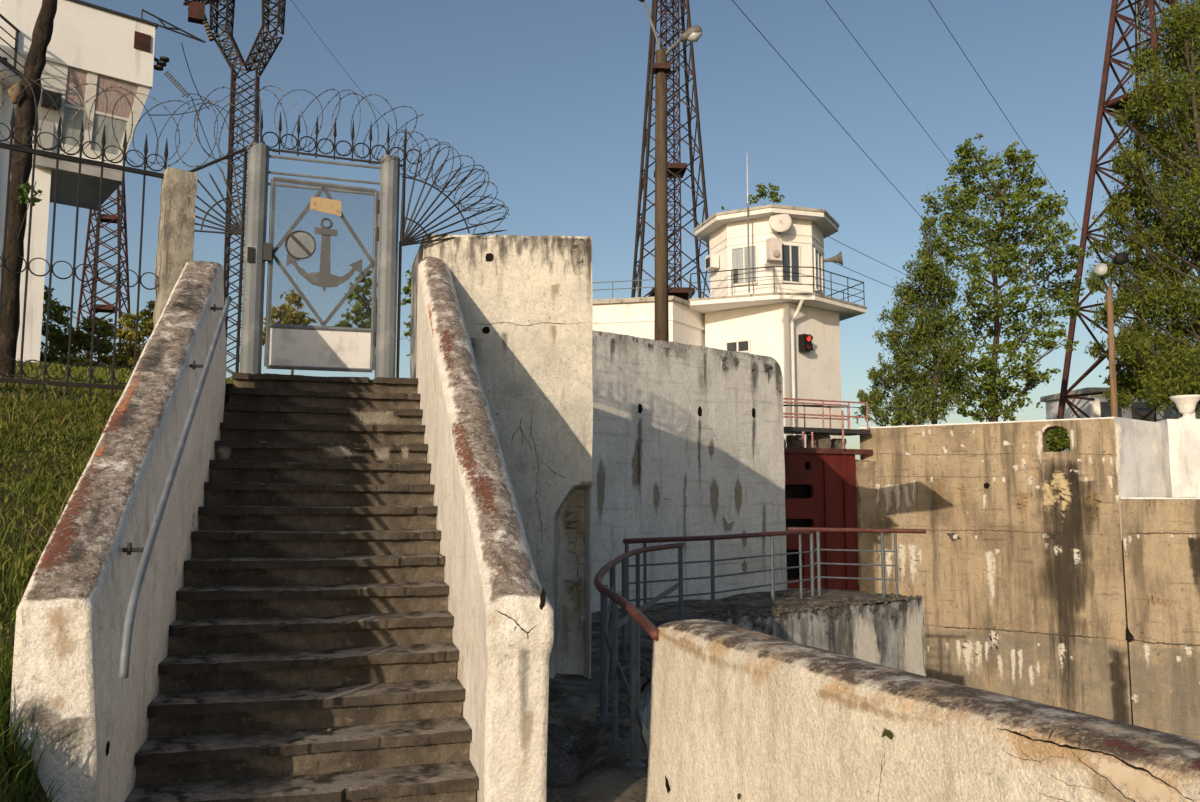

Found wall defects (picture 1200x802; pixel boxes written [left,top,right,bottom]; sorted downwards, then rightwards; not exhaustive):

damp [545,238,591,282]
corrosion [428,305,455,375]
corrosion [33,373,140,575]
corrosion [451,420,498,514]
crack [496,400,565,588]
damp [876,480,916,515]
damp [879,543,923,583]
damp [983,423,1121,702]
damp [1171,534,1200,584]
damp [946,630,1040,686]
damp [24,705,81,741]
crack [997,728,1200,802]